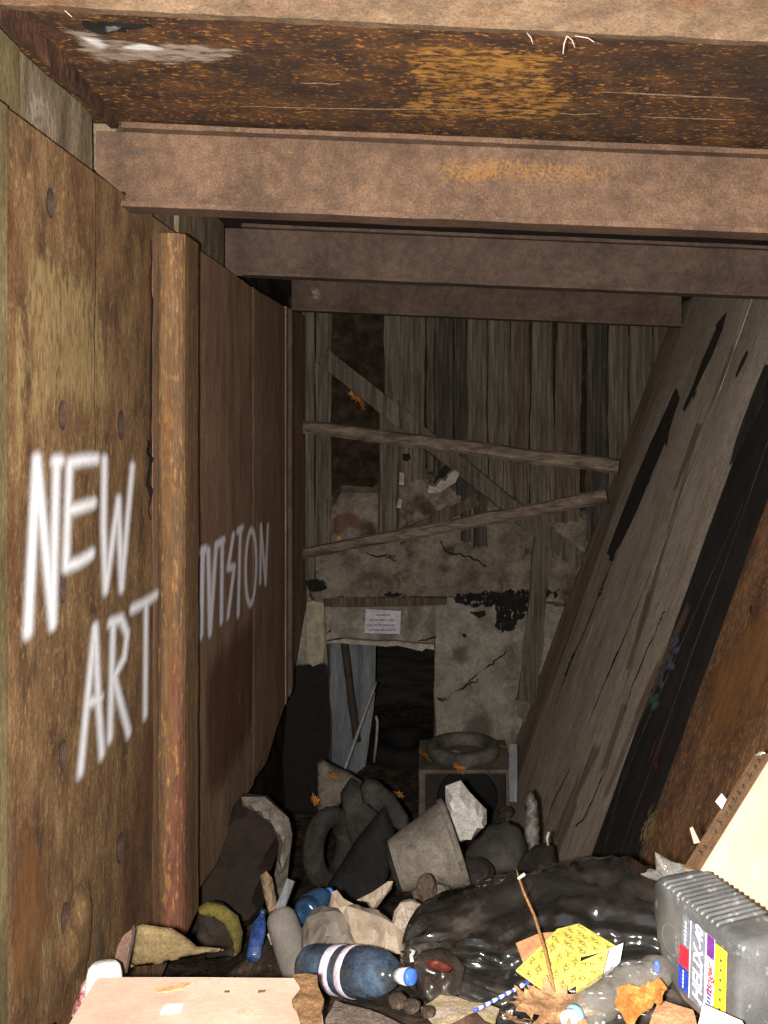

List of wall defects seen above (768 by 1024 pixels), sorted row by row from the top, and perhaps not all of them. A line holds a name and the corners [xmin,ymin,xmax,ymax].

water stain [69,32,232,64]
rust [392,46,574,122]
crack [146,239,154,520]
crack [440,541,487,567]
peeling [453,589,529,633]
crack [437,650,507,702]